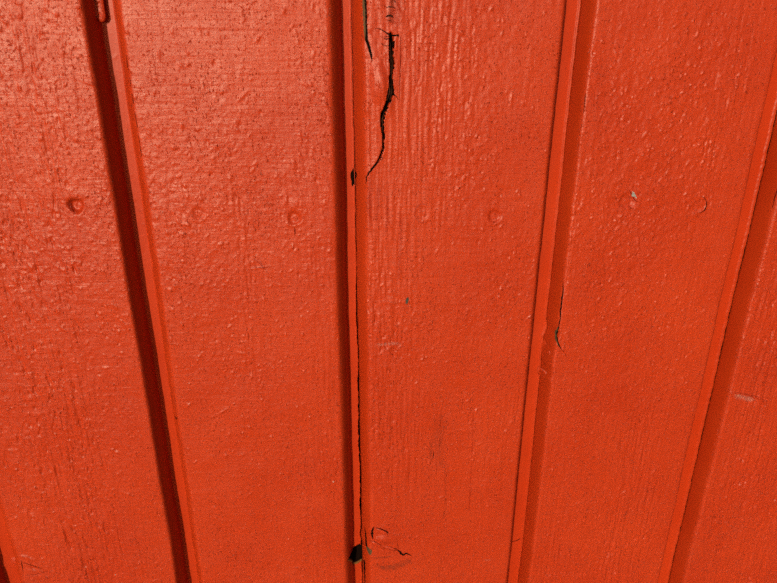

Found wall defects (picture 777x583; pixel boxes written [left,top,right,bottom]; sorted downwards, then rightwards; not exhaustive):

crack [352,0,401,182]
crack [555,286,566,355]